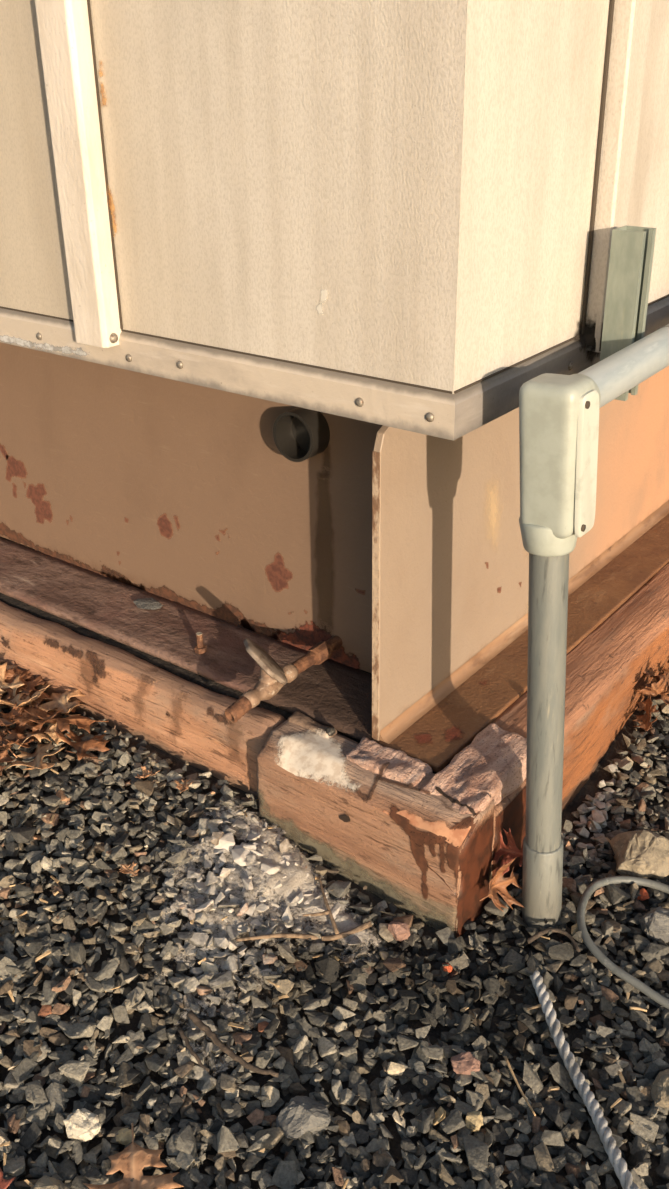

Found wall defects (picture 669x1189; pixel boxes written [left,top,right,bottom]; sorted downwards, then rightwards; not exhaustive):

corrosion [108,191,117,235]
leakage [316,446,332,632]
peeling [0,522,281,640]
peeling [265,552,293,592]
peeling [44,639,106,683]
peeling [207,707,231,725]
crack [345,762,476,815]
leakage [258,786,526,938]